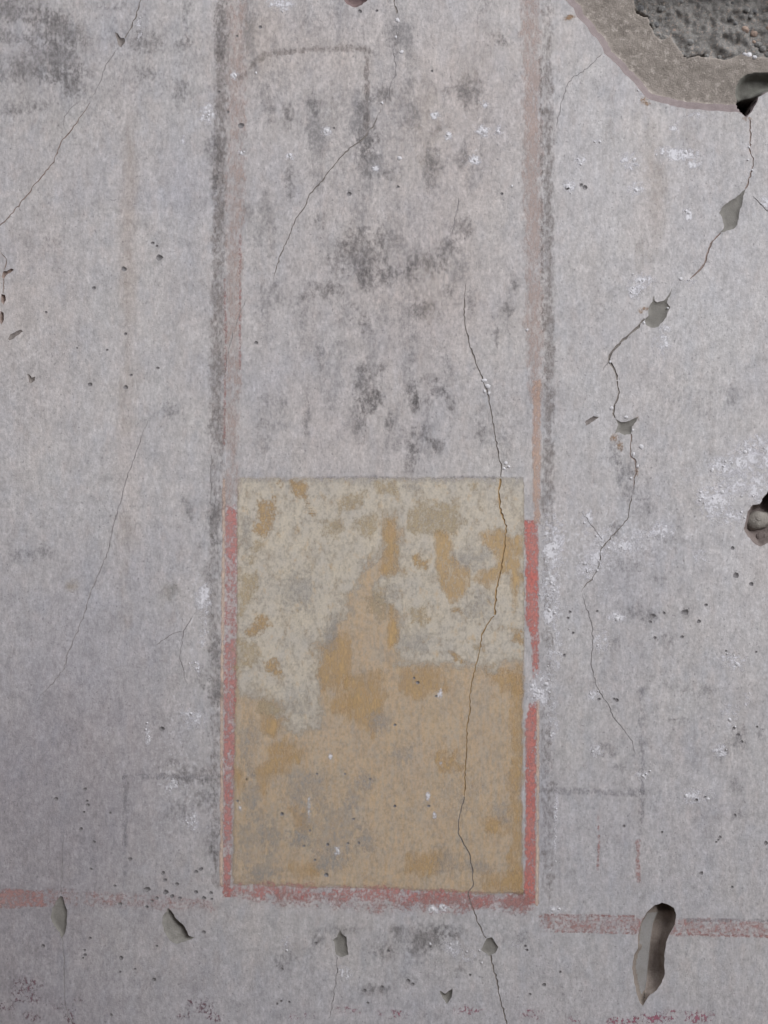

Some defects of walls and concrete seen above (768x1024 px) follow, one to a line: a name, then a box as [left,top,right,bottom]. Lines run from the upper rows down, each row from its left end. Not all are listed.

crack [0,0,141,226]
crack [273,0,403,278]
spalling [566,0,768,118]
flaking render [655,147,700,168]
crack [745,119,768,212]
crack [679,233,721,280]
crack [582,307,669,752]
flaking render [696,434,768,547]
crack [458,285,510,1024]
hole [632,903,676,1005]